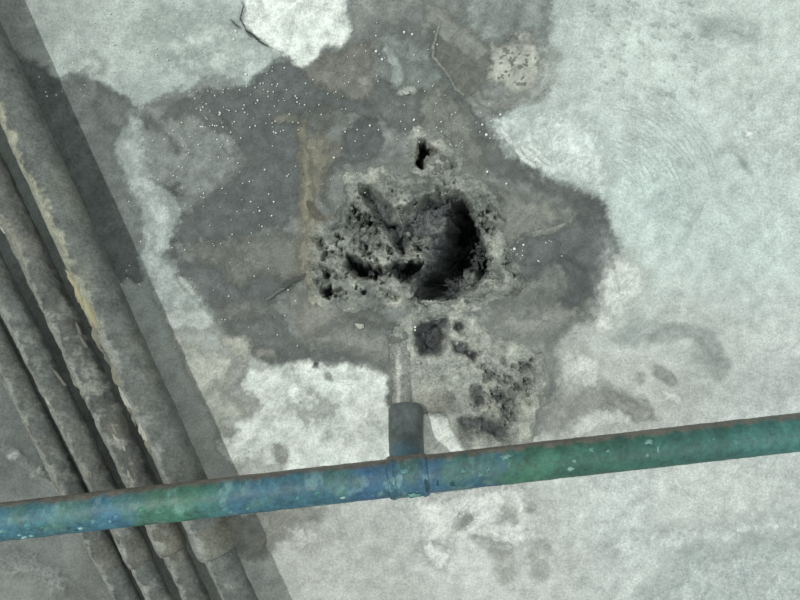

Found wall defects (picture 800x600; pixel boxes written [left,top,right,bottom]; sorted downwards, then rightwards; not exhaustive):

crack [231,3,268,46]
water stain [14,0,654,454]
spalling [301,165,549,460]
water stain [654,366,683,405]